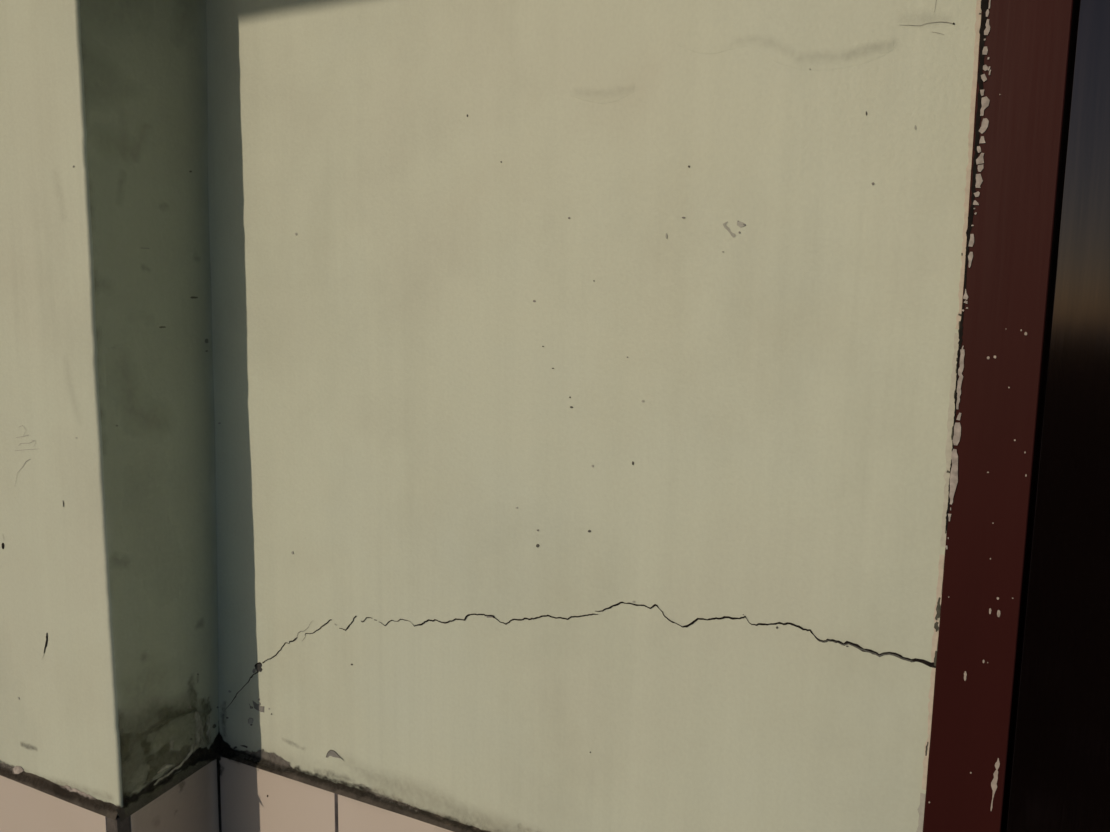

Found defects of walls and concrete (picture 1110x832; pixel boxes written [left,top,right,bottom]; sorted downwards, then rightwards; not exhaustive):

peeling [916,0,991,832]
crack [229,602,936,705]
leakage [0,673,484,832]